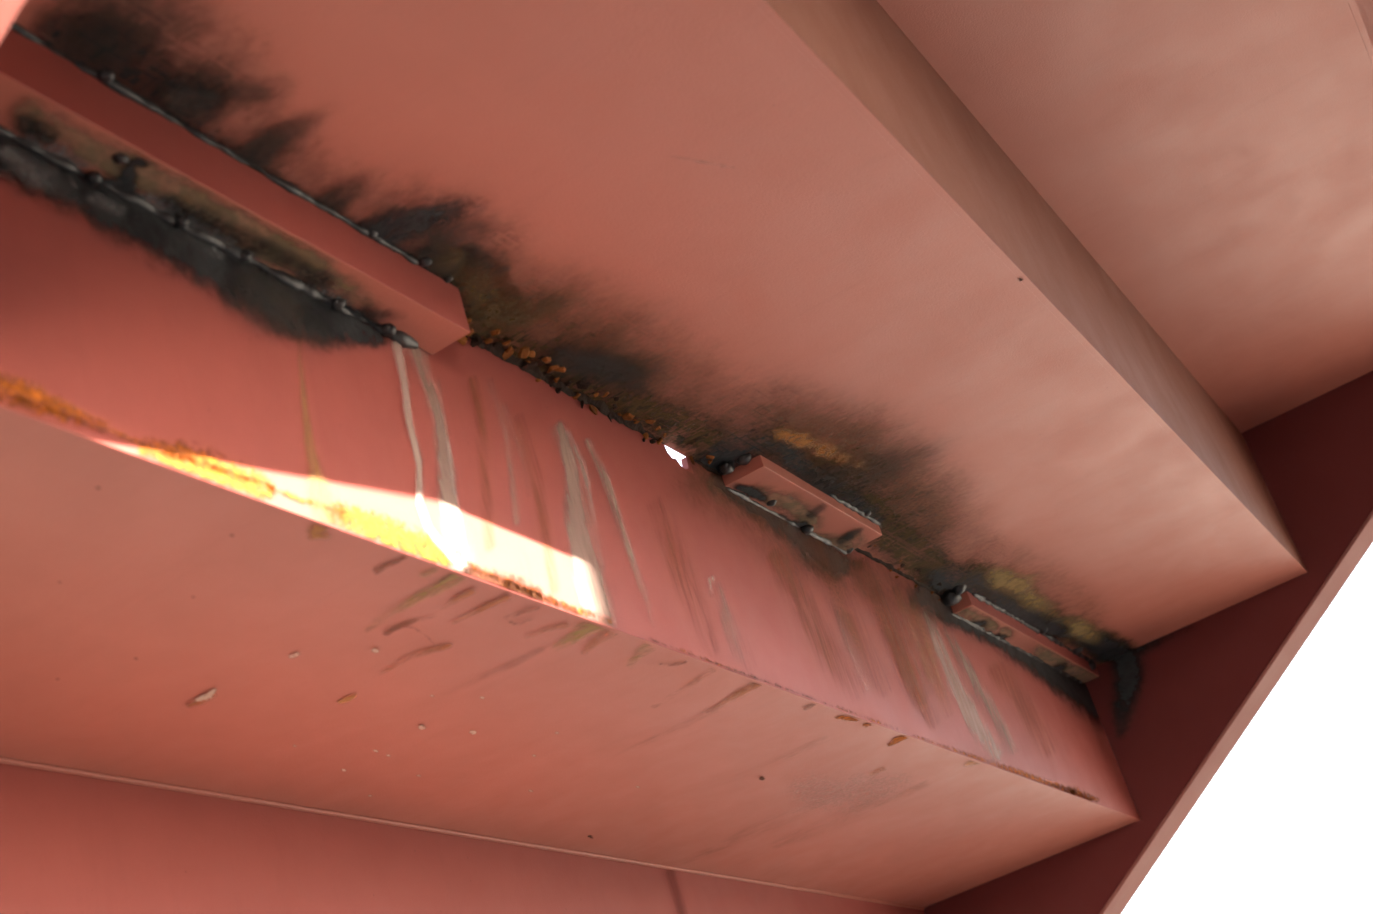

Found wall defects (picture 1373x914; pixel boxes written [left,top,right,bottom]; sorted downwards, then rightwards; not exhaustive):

damp [15,101,388,327]
corrosion [0,375,613,648]
damp [394,342,470,607]
damp [557,422,635,645]
damp [734,484,862,551]
peeling [188,689,216,707]
damp [910,602,1013,760]
corrosion [887,735,1099,802]
damp [1034,647,1098,683]